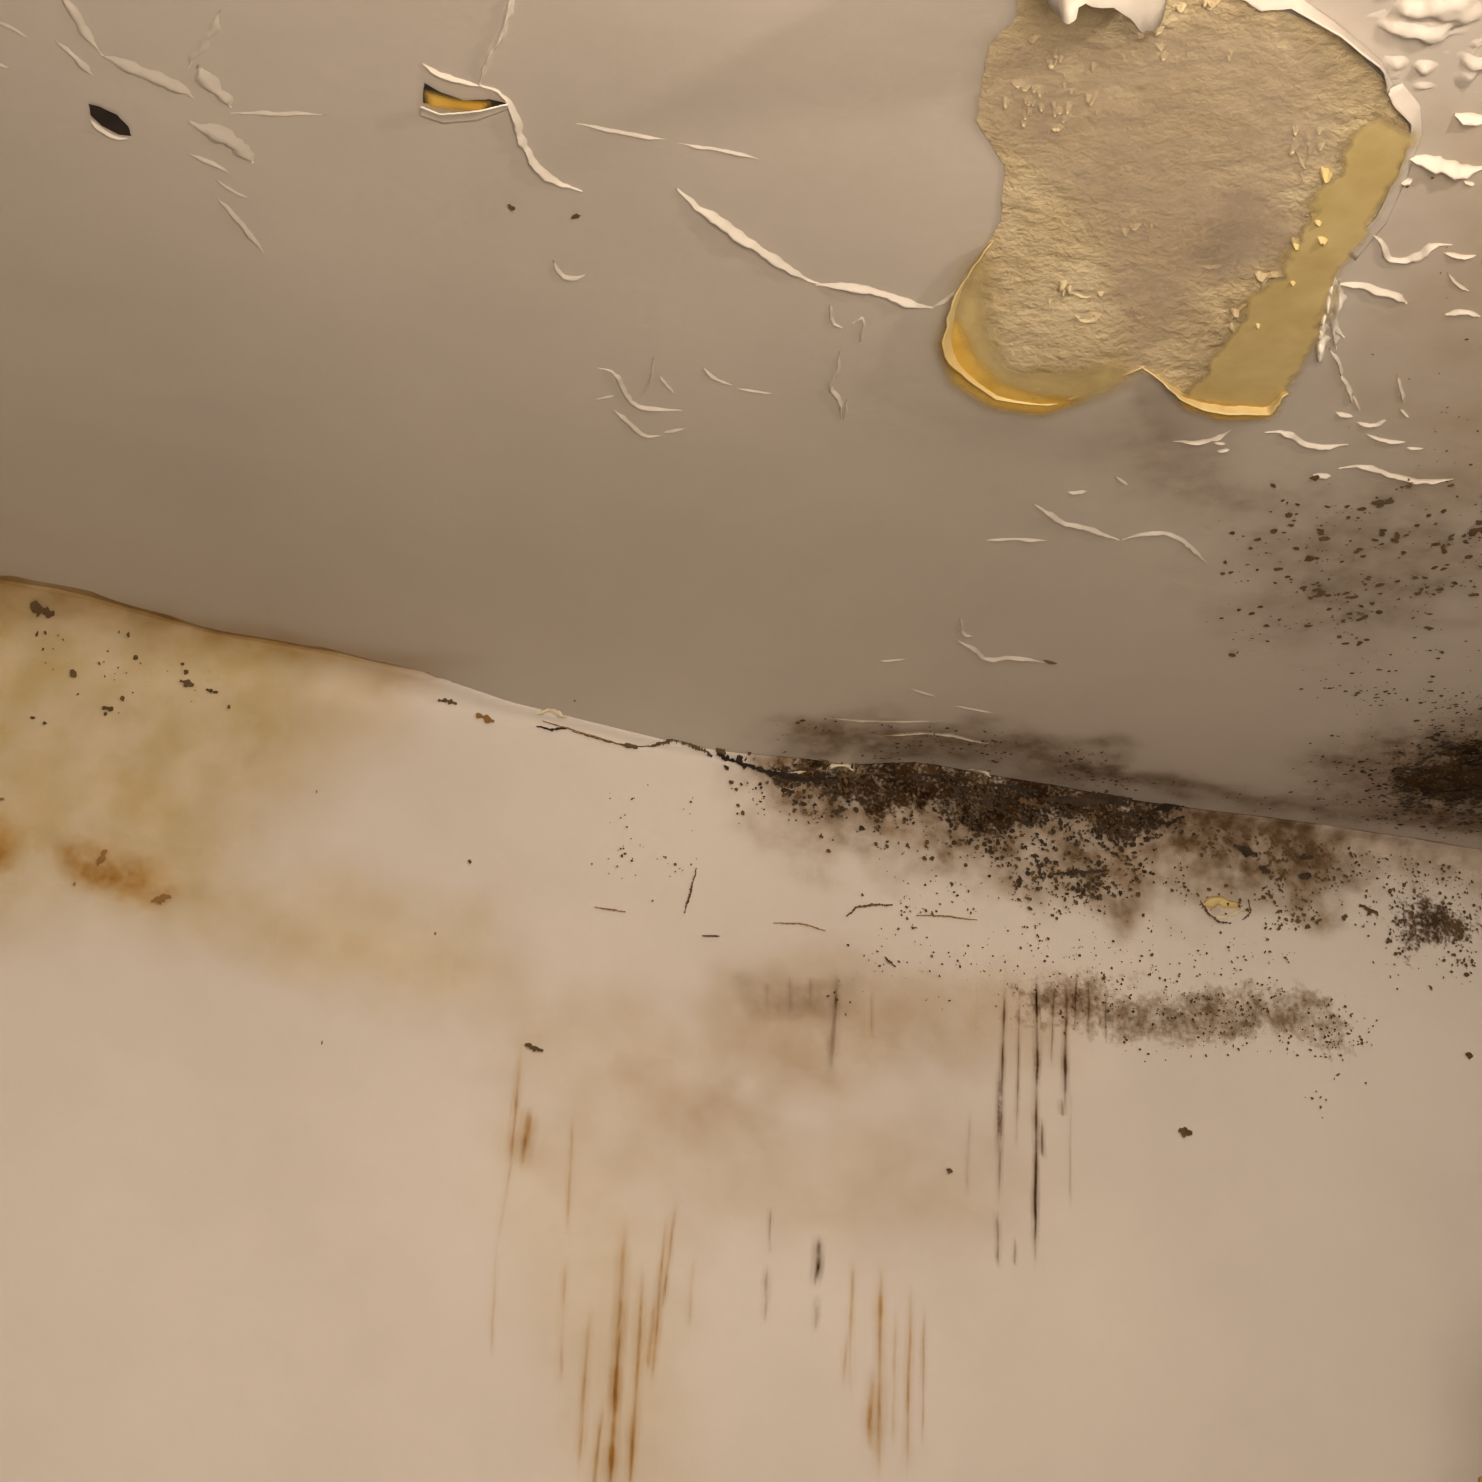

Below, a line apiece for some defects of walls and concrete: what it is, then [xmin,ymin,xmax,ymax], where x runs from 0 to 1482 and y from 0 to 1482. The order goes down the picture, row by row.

peeling [940,0,1424,453]
peeling [598,357,687,438]
peeling [702,366,772,394]
damp [30,600,79,696]
damp [98,650,141,716]
damp [167,662,230,709]
damp [724,431,1482,1089]
rust [151,894,171,905]
damp [1034,1104,1043,1237]